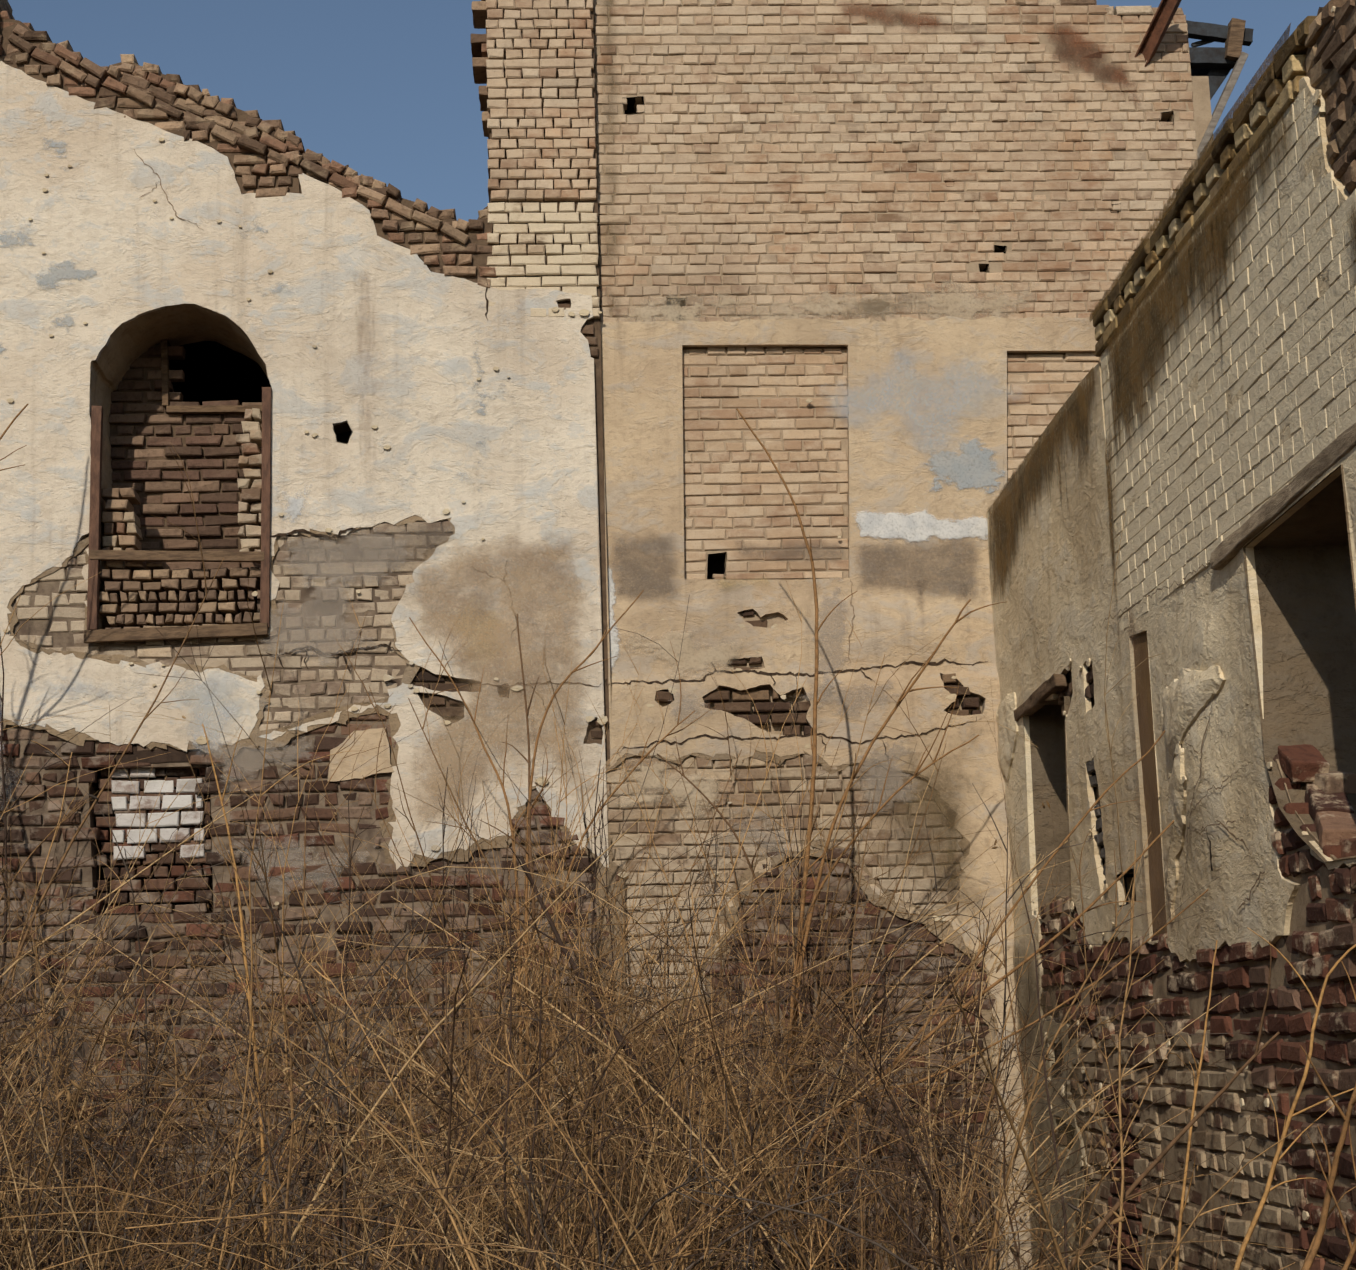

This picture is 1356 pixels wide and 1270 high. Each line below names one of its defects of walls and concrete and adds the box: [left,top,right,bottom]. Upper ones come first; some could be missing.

water stain [1089,23,1291,322]
water stain [988,105,1291,603]
water stain [420,549,577,810]
flaking render [0,493,1005,1270]
crack [482,580,988,867]
water stain [862,544,974,595]
flaking render [1032,754,1356,1270]
crack [1176,698,1264,943]